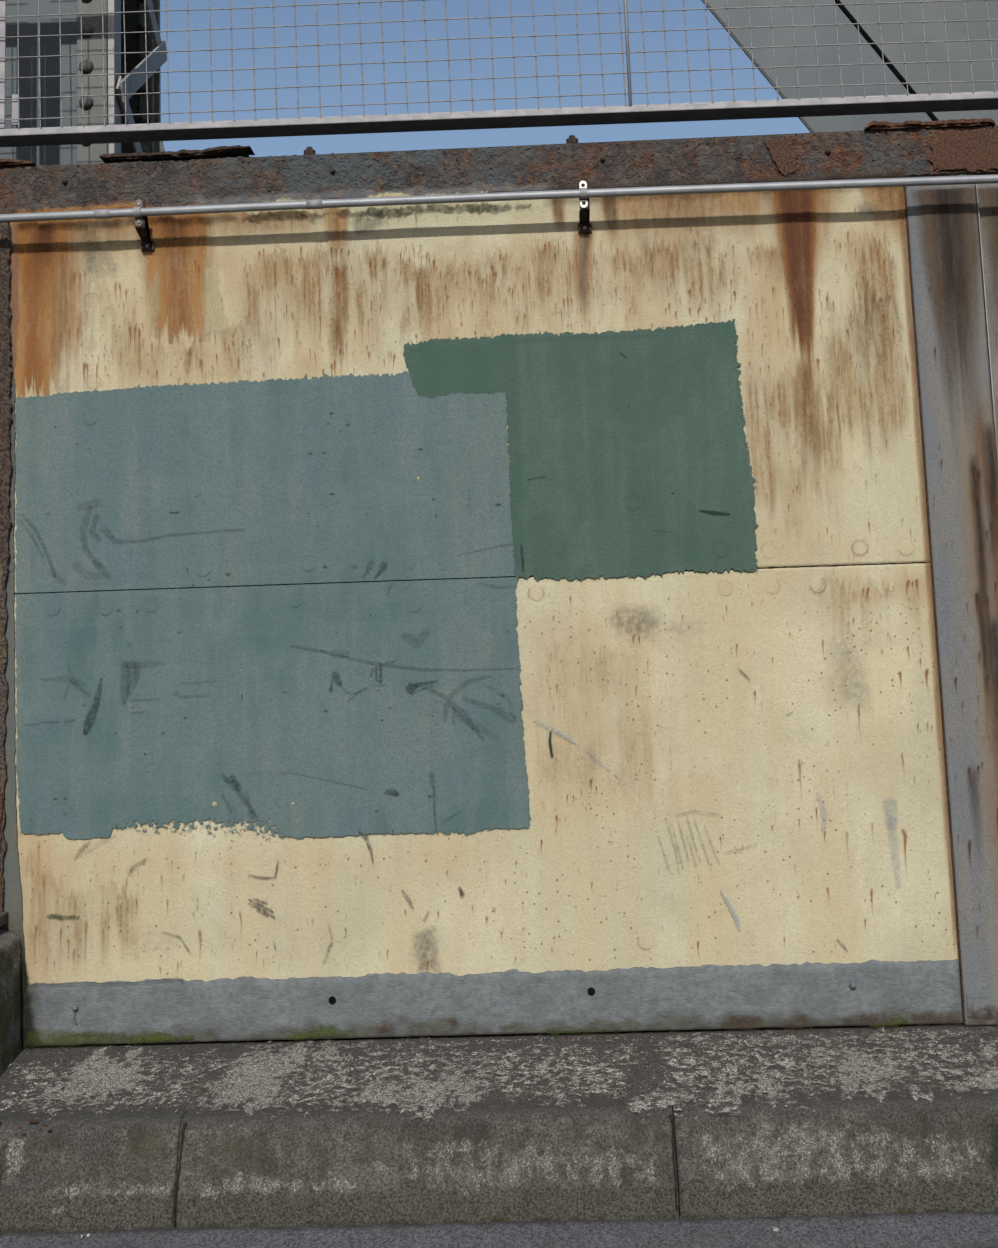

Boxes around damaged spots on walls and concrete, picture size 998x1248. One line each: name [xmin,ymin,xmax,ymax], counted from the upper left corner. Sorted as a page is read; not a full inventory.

corrosion [864,118,996,131]
corrosion [0,158,37,168]
corrosion [99,145,255,163]
corrosion [9,202,299,398]
corrosion [246,207,381,373]
corrosion [400,254,459,314]
corrosion [550,168,909,503]
damp [6,1137,24,1177]
damp [45,1179,170,1213]
damp [200,1171,356,1200]
damp [369,1137,660,1194]
damp [701,1121,980,1189]